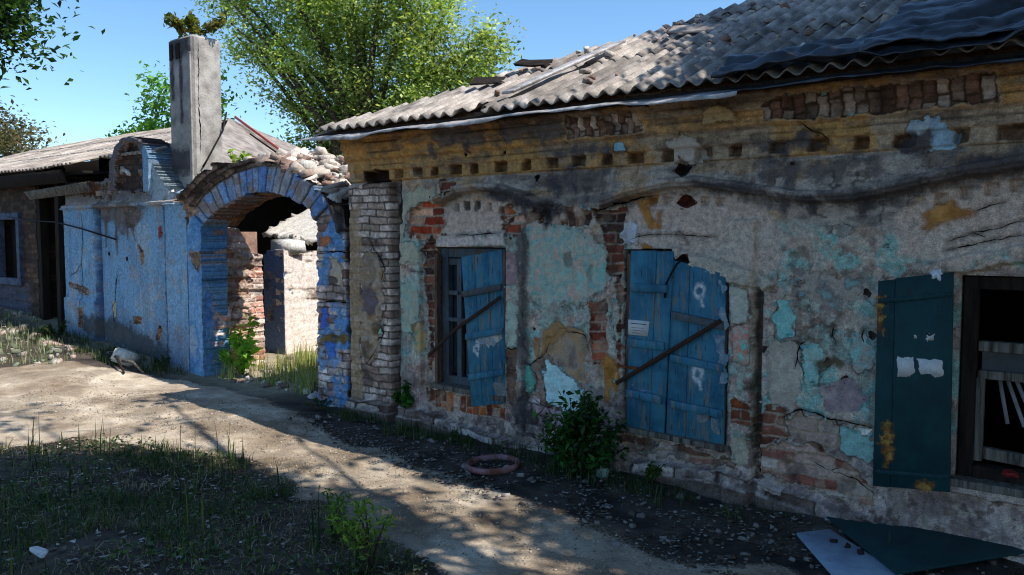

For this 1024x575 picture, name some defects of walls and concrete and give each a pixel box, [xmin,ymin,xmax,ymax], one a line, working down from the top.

spalling [762,71,1000,152]
damp [689,129,926,215]
damp [944,148,1024,179]
crack [945,202,1021,252]
spalling [399,178,456,370]
peeling [498,203,638,383]
peeling [320,308,336,360]
peeling [427,300,584,442]
spalling [636,300,875,506]
crack [784,409,871,435]
crack [812,460,872,492]
rust [880,421,895,467]